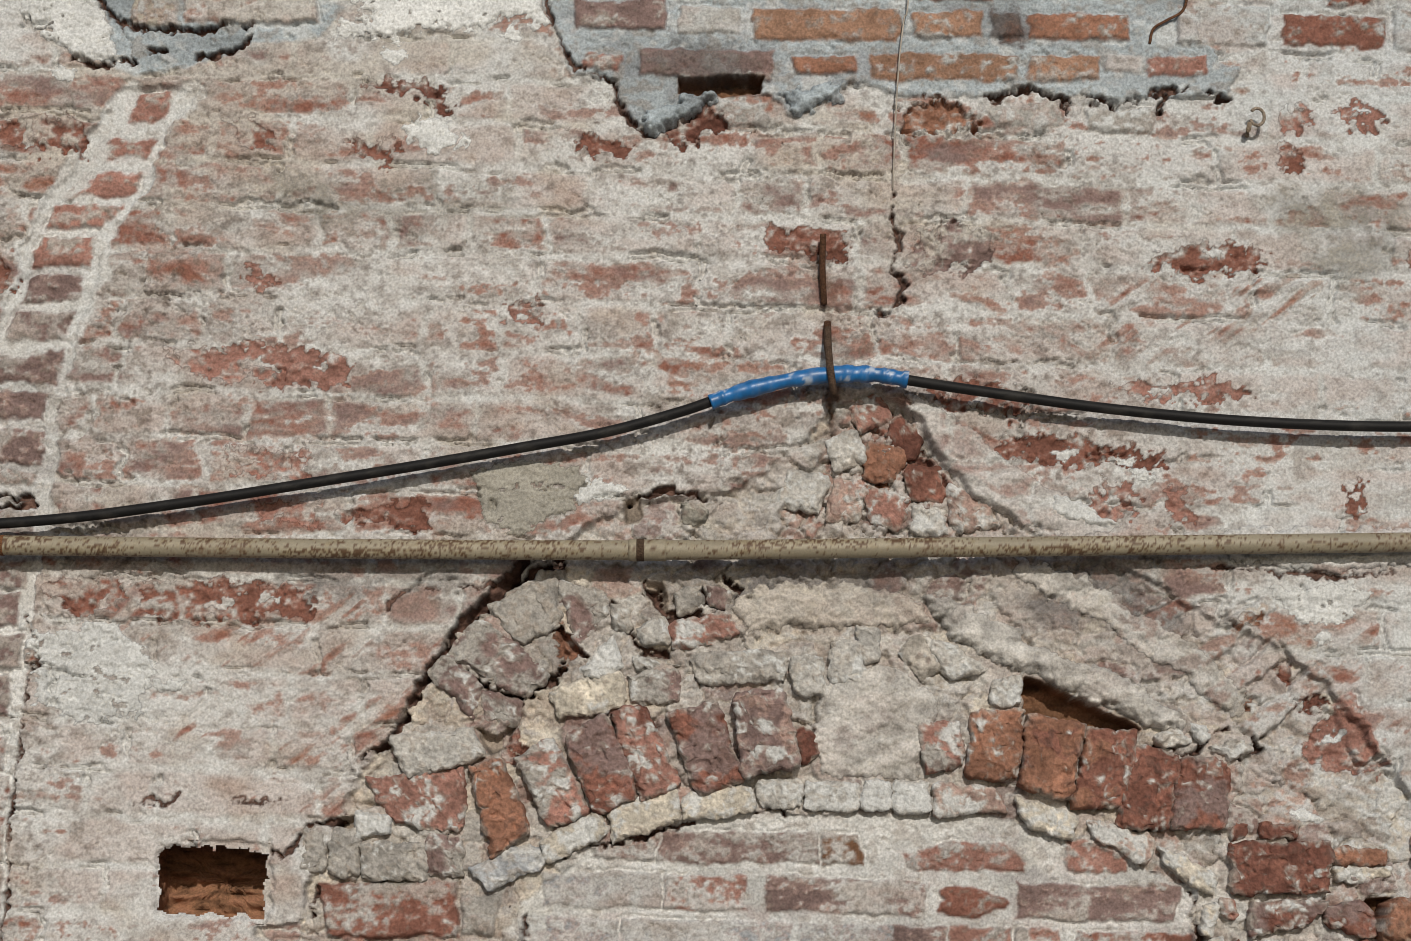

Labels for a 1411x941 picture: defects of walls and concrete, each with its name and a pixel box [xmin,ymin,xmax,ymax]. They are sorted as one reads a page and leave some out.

peeling [20,0,122,82]
spalling [662,103,728,153]
spalling [892,94,987,138]
crack [877,193,909,318]
crack [363,560,566,760]
crack [478,626,588,701]
spalling [1272,660,1391,782]
crack [0,615,41,941]
peeling [1289,808,1324,823]
crack [1189,892,1203,941]